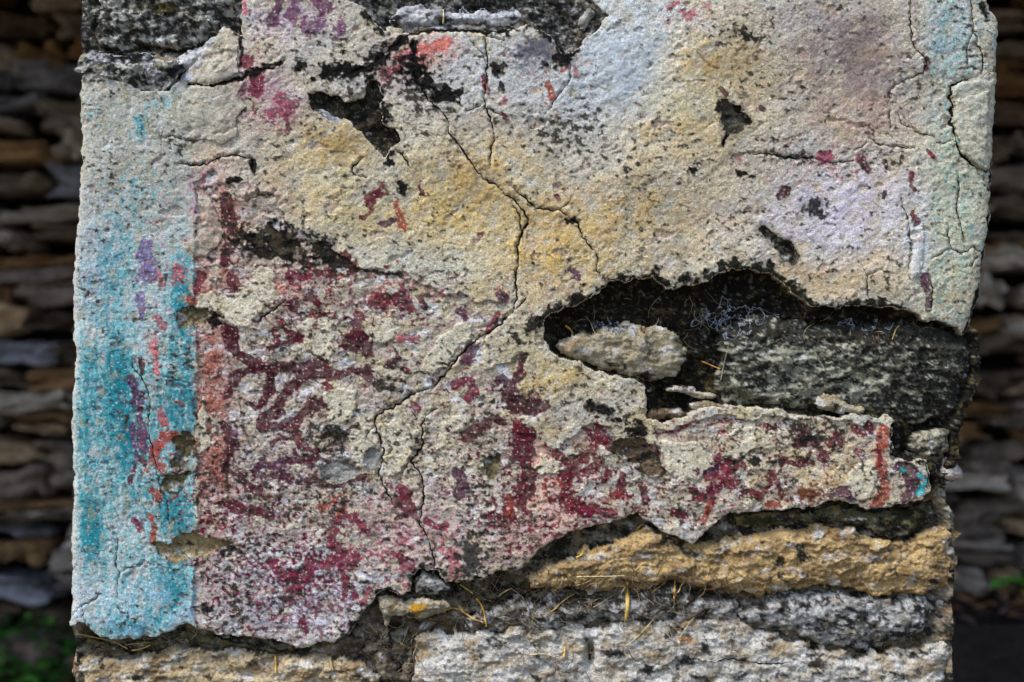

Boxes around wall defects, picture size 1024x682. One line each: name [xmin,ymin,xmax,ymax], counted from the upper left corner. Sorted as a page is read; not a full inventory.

flaking render [74,0,246,144]
spalling [308,81,400,157]
spalling [349,0,608,54]
spalling [720,99,752,146]
crack [754,0,988,308]
crack [354,28,601,563]
flaking render [75,268,982,682]